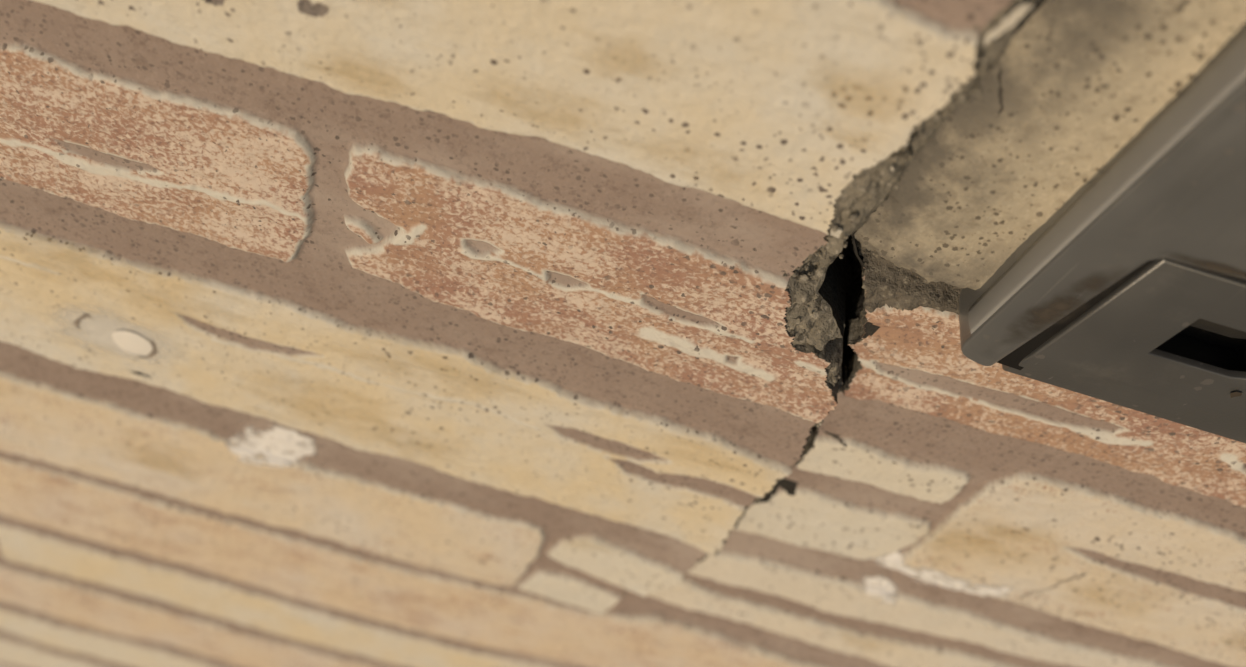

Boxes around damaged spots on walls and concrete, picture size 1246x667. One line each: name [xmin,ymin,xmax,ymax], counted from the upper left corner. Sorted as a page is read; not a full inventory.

peeling [296,0,330,17]
crack [607,0,1053,611]